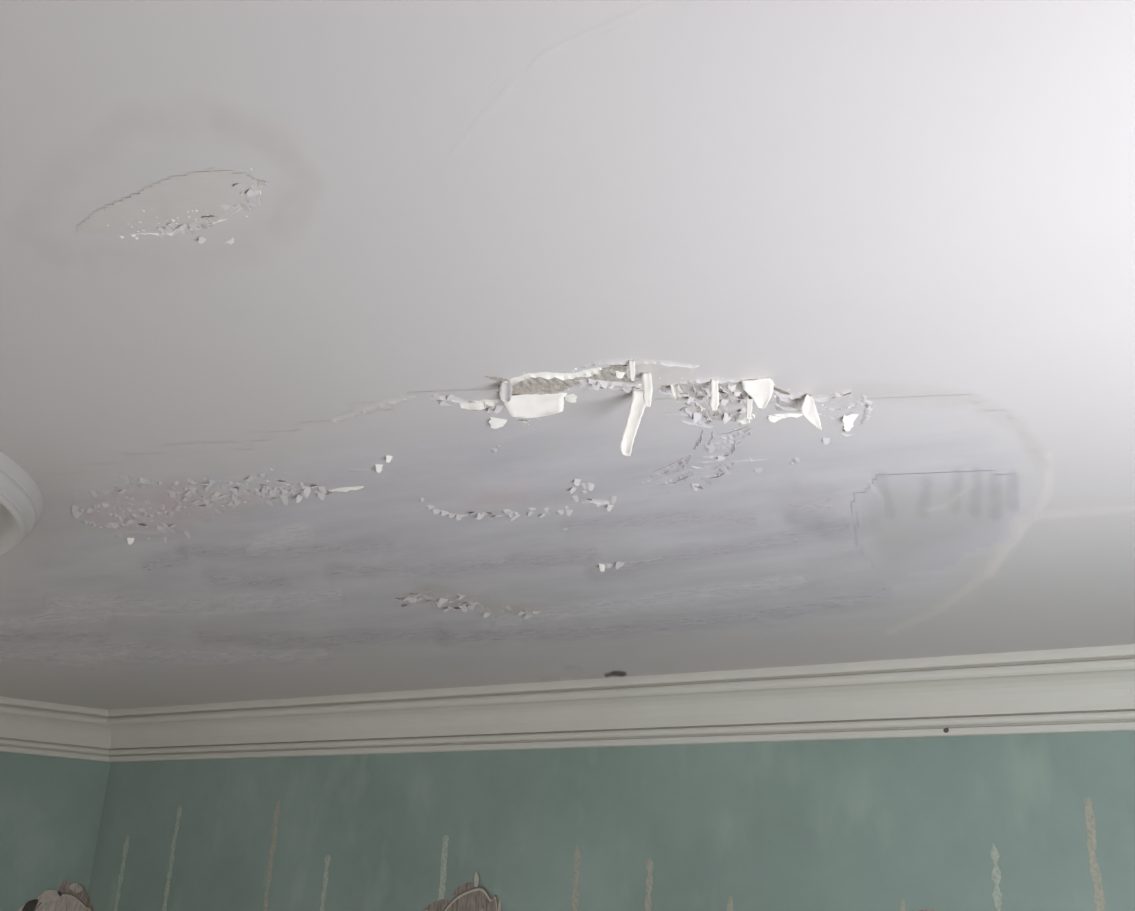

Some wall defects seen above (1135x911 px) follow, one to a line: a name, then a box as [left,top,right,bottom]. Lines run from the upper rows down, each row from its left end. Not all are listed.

damp [0,385,1053,694]
peeling [429,359,873,503]